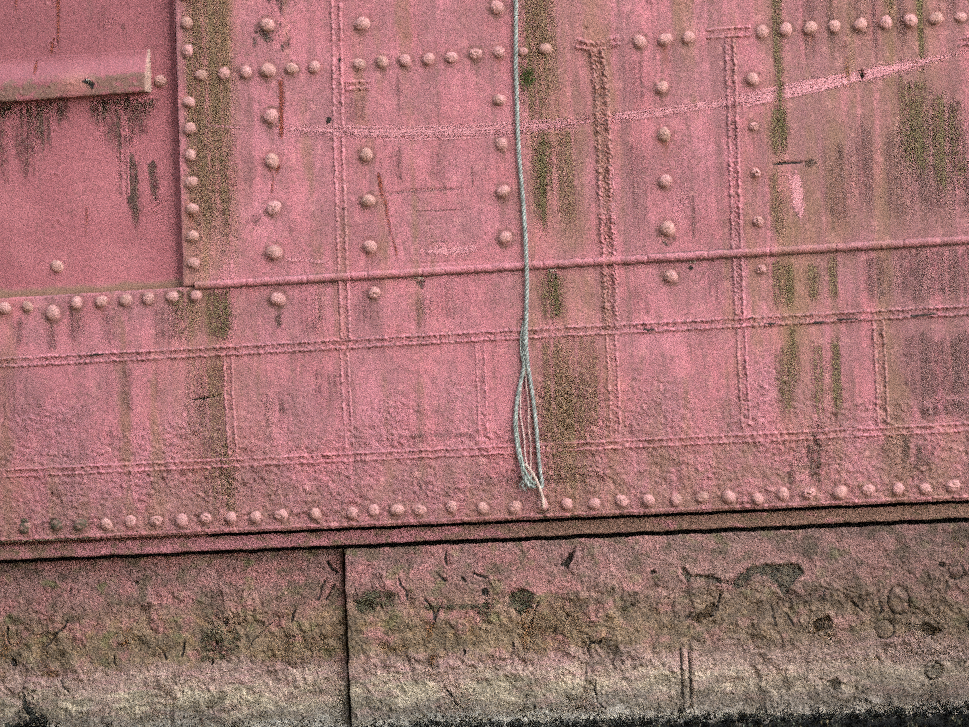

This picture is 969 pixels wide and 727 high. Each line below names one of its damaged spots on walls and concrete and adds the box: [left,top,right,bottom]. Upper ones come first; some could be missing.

leakage [0,95,68,175]
leakage [91,96,159,226]
corrosion [377,172,397,257]
leakage [812,341,842,414]
peeling [508,589,535,615]
peeling [560,547,582,574]
peeling [681,563,815,623]
leakage [363,694,969,727]